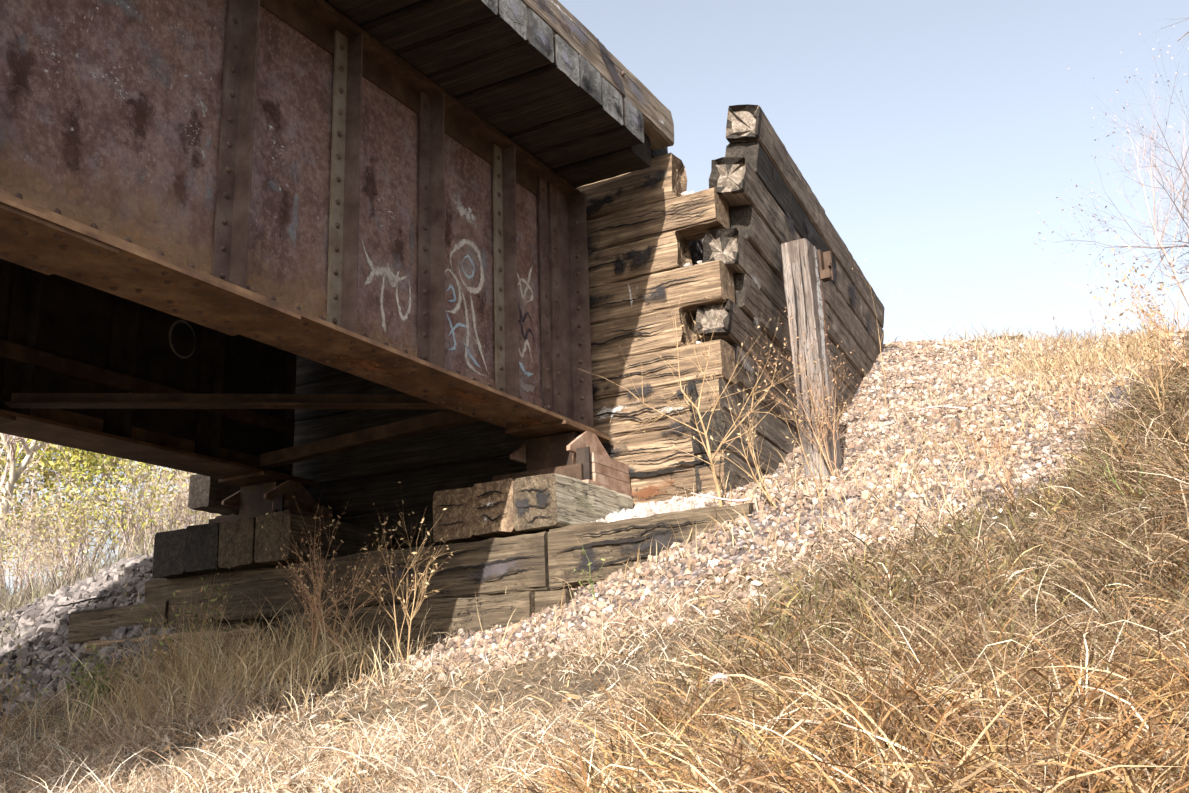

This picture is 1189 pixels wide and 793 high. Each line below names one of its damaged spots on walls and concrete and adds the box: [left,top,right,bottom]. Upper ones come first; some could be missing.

corrosion [6,36,34,95]
corrosion [127,93,149,135]
corrosion [179,110,203,166]